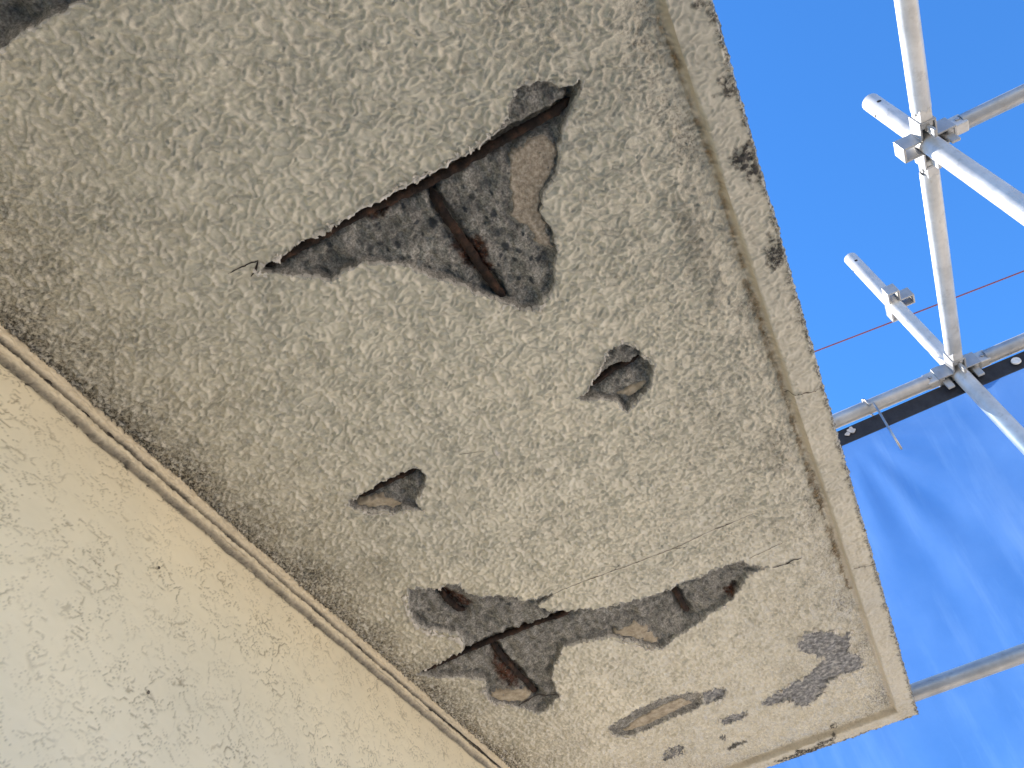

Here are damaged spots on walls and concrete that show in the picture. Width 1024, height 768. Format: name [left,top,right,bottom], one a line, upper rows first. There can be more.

spalling [253,78,585,313]
rust [453,235,494,270]
spalling [576,339,657,414]
spalling [344,466,428,517]
rust [444,587,473,605]
rust [491,641,518,686]
spalling [401,560,770,715]
peeling [761,628,865,708]
spalling [607,687,727,740]